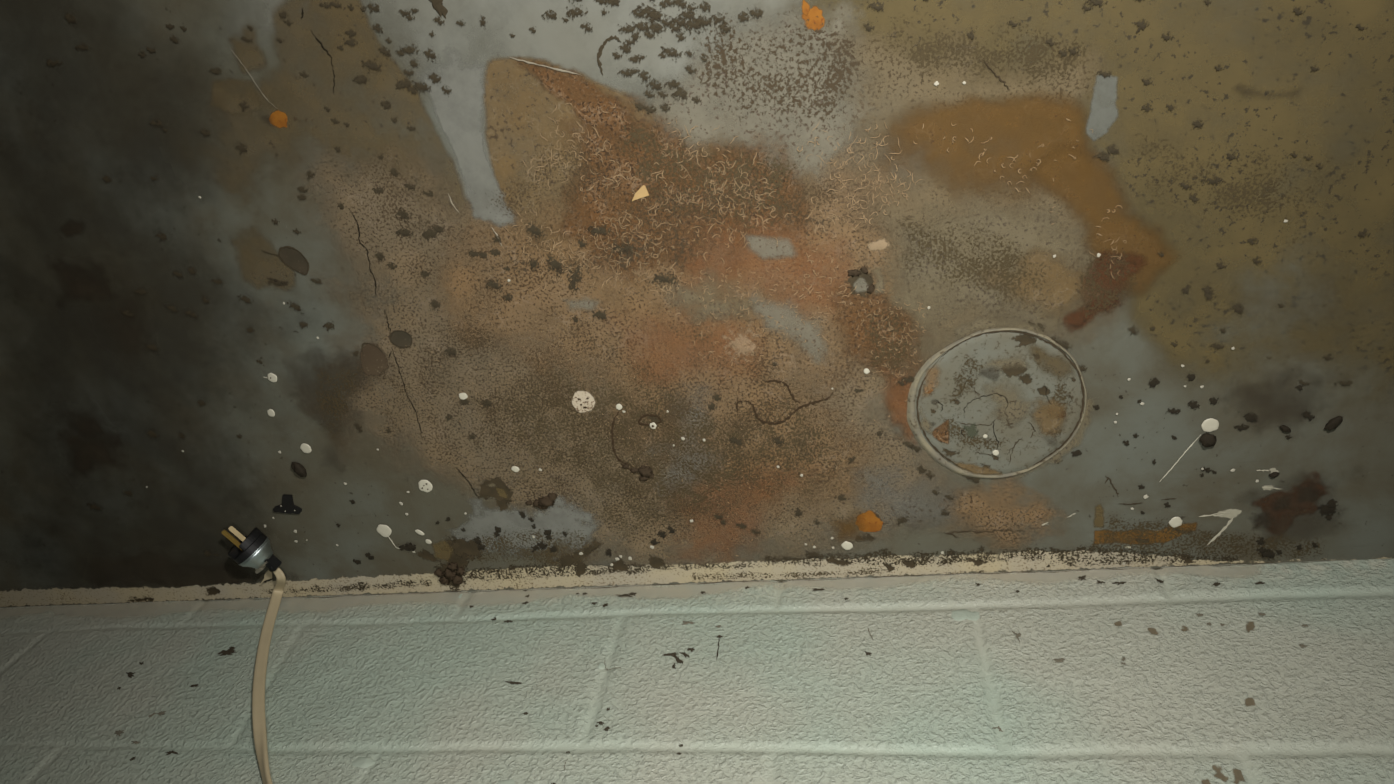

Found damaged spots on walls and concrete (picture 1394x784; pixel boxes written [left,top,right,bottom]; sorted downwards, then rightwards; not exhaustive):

crack [301,8,335,91]
rust [520,62,807,271]
damp [212,0,1394,567]
rust [891,97,1172,330]
rust [837,292,937,433]
rust [840,510,883,544]
rust [1253,476,1325,534]